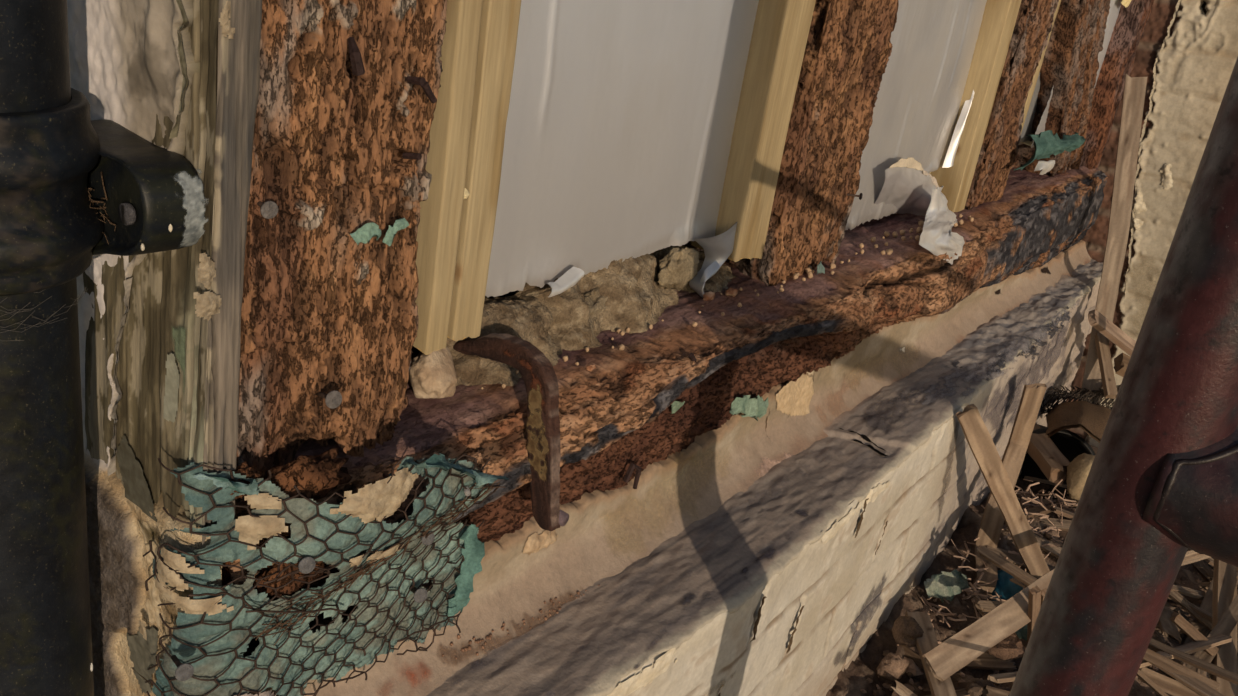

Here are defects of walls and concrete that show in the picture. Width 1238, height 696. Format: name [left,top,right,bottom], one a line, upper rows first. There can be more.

peeling [169,0,188,139]
crack [839,428,888,456]